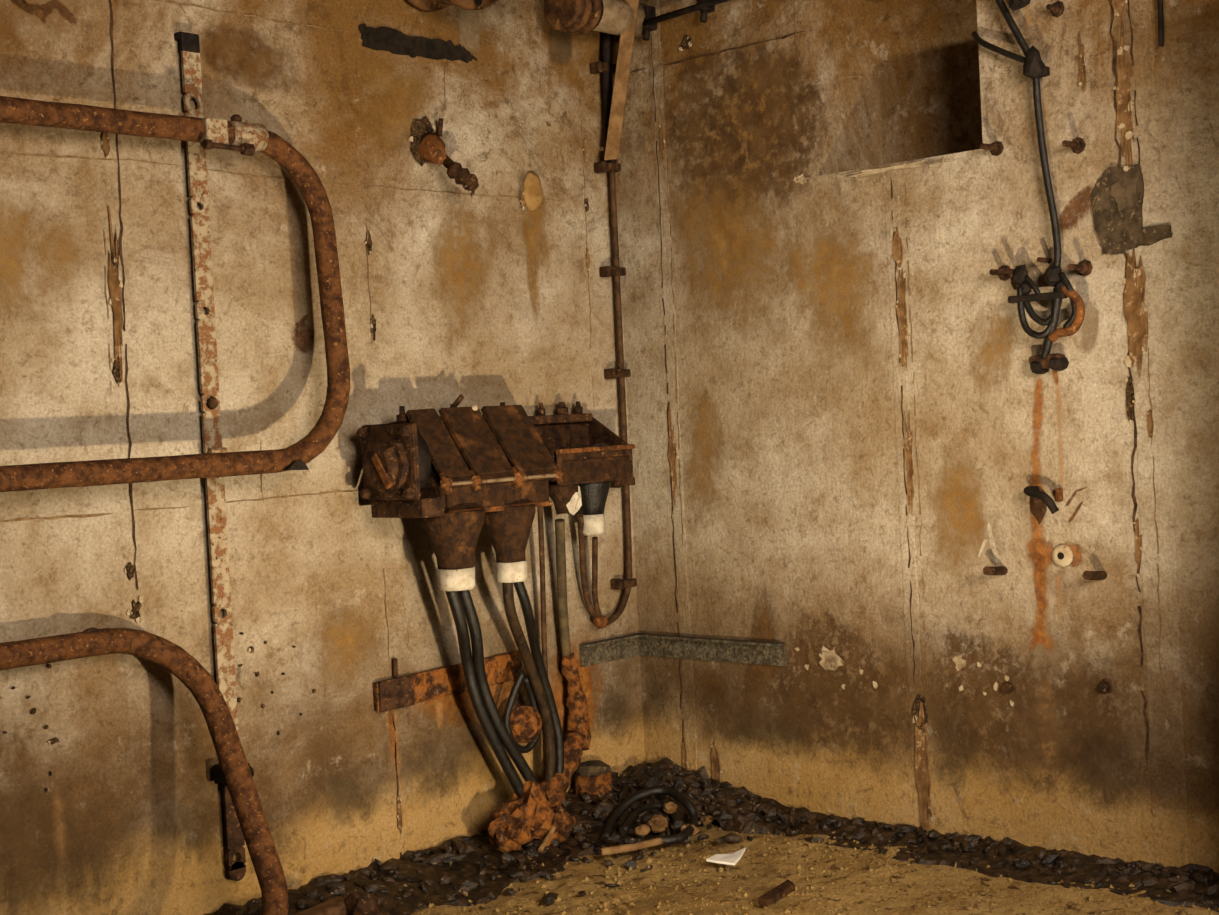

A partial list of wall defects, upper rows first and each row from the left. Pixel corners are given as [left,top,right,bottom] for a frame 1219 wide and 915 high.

spalling [107,205,124,387]
rust [1031,370,1060,490]
rust [1028,516,1082,648]
water stain [701,617,902,751]
water stain [937,632,1130,801]